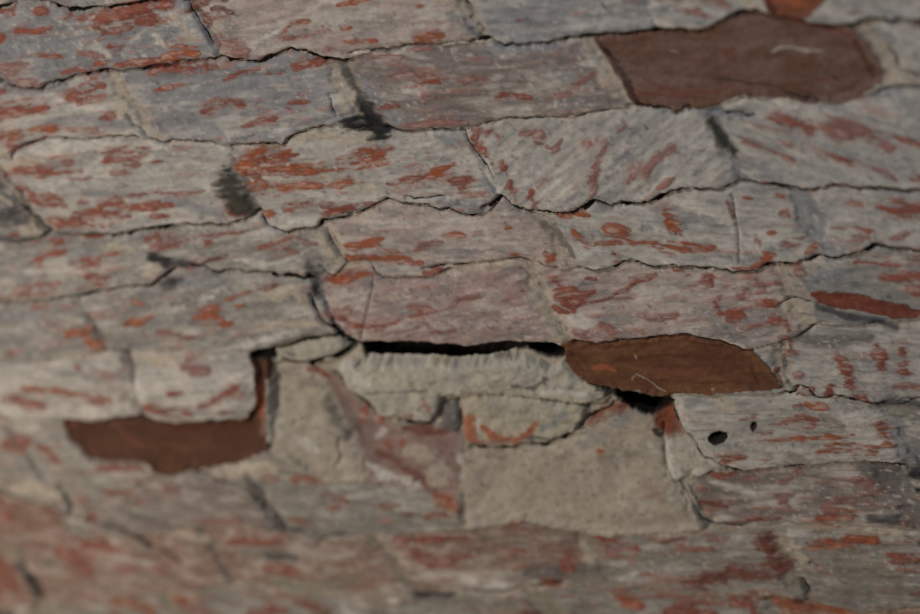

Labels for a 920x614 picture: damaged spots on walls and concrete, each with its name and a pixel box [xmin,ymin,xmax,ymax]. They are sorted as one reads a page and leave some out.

crack [46,0,149,11]
crack [8,2,680,89]
spalling [591,0,882,112]
crack [2,102,337,159]
crack [394,109,609,174]
peeling [234,146,392,217]
peeling [15,186,205,263]
peeling [325,232,466,284]
crack [6,179,920,332]
spalling [810,291,920,319]
crack [784,385,918,404]
spalling [63,304,783,569]